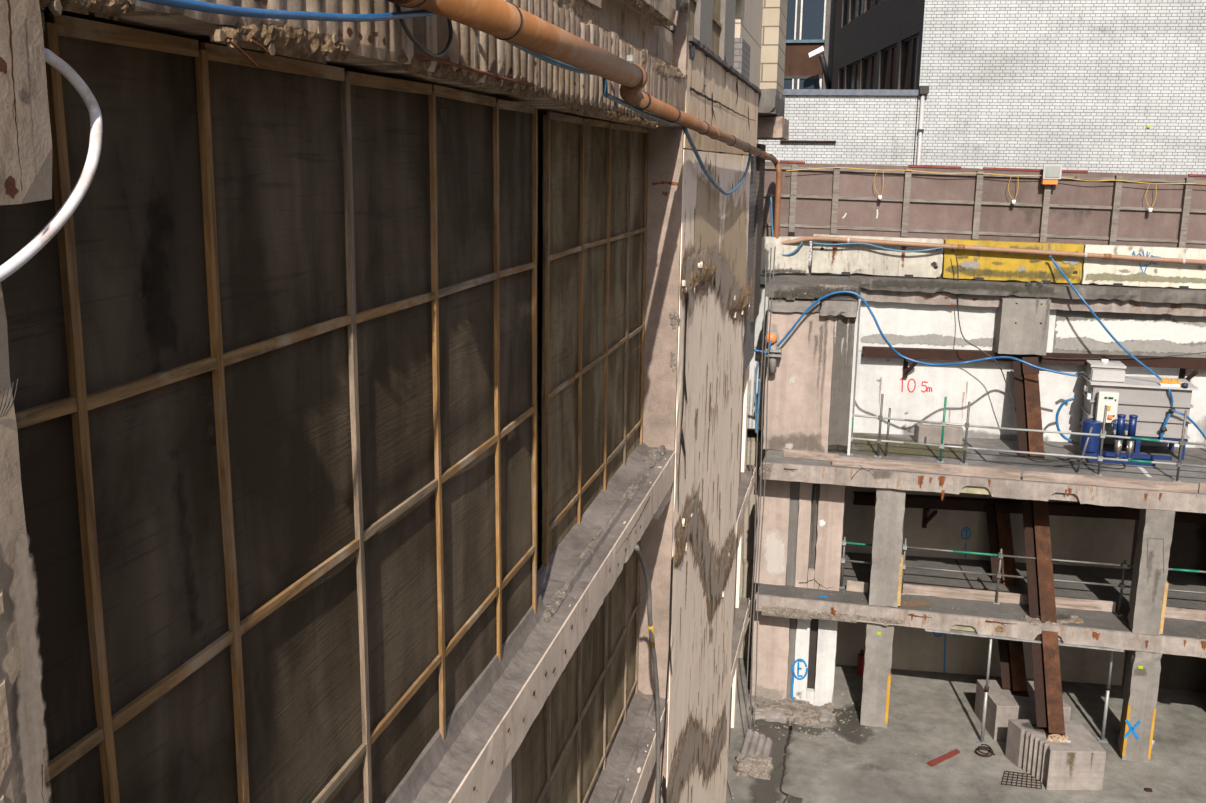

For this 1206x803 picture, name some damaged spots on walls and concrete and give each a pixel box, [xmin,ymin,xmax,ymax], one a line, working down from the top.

spalling [39,0,137,21]
spalling [210,21,349,67]
corrosion [4,176,19,199]
peeling [674,156,752,803]
peeling [0,532,51,803]